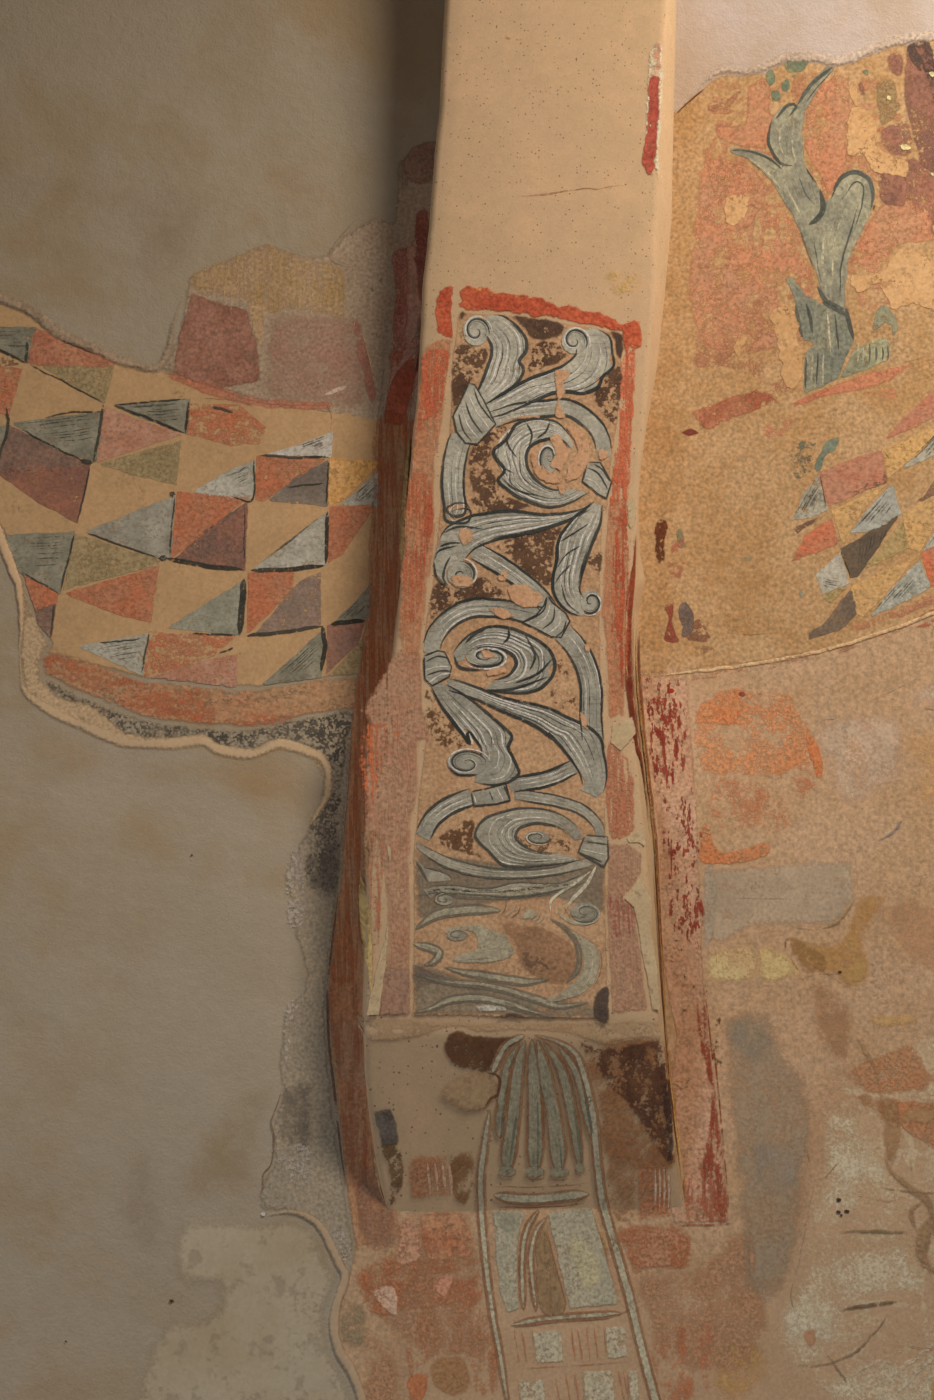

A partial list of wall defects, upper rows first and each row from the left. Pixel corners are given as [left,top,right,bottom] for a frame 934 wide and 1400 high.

flaking render [17,569,201,739]
flaking render [260,729,353,1261]
spalling [367,926,389,1015]